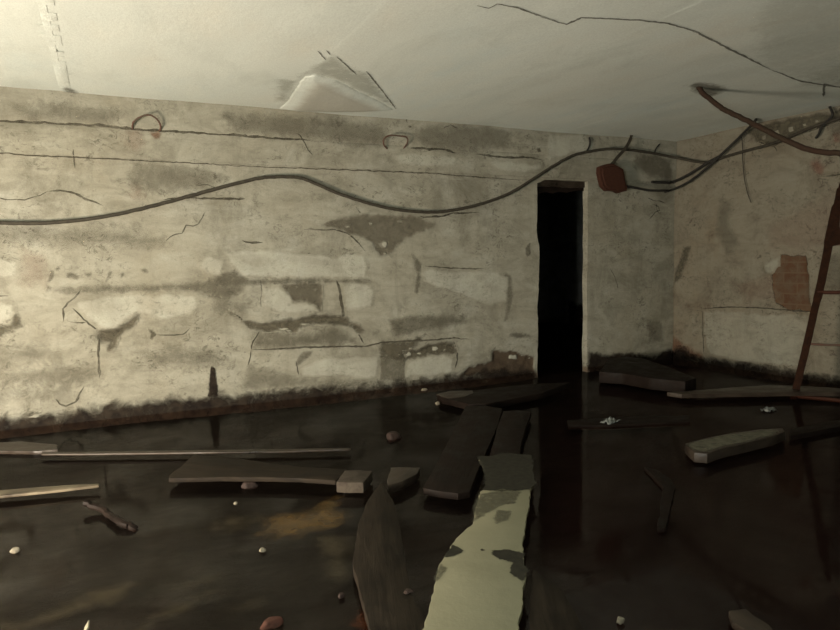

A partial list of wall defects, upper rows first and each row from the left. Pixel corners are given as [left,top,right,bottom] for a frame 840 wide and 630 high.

crack [479,4,840,96]
crack [62,291,100,368]
leakage [0,314,536,439]
crack [248,281,460,375]
leakage [588,348,840,388]
peeling [702,253,811,371]